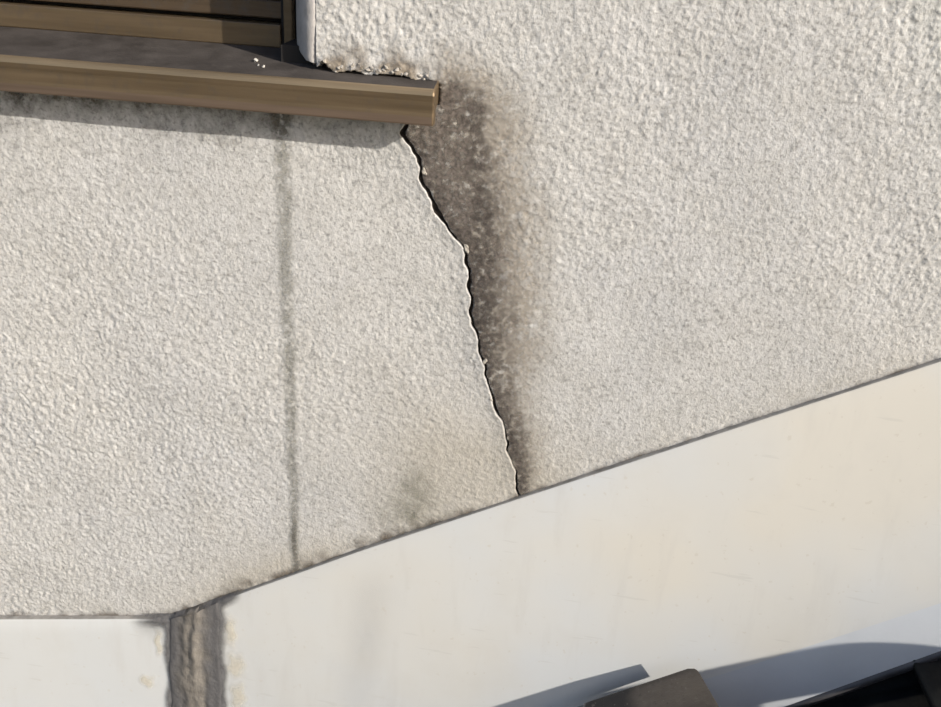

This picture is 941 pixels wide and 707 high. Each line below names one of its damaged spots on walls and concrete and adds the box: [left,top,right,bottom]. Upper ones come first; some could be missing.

leakage [271,113,299,571]
crack [400,124,520,495]
leakage [408,68,534,489]
leakage [147,612,183,707]
leakage [202,590,238,707]